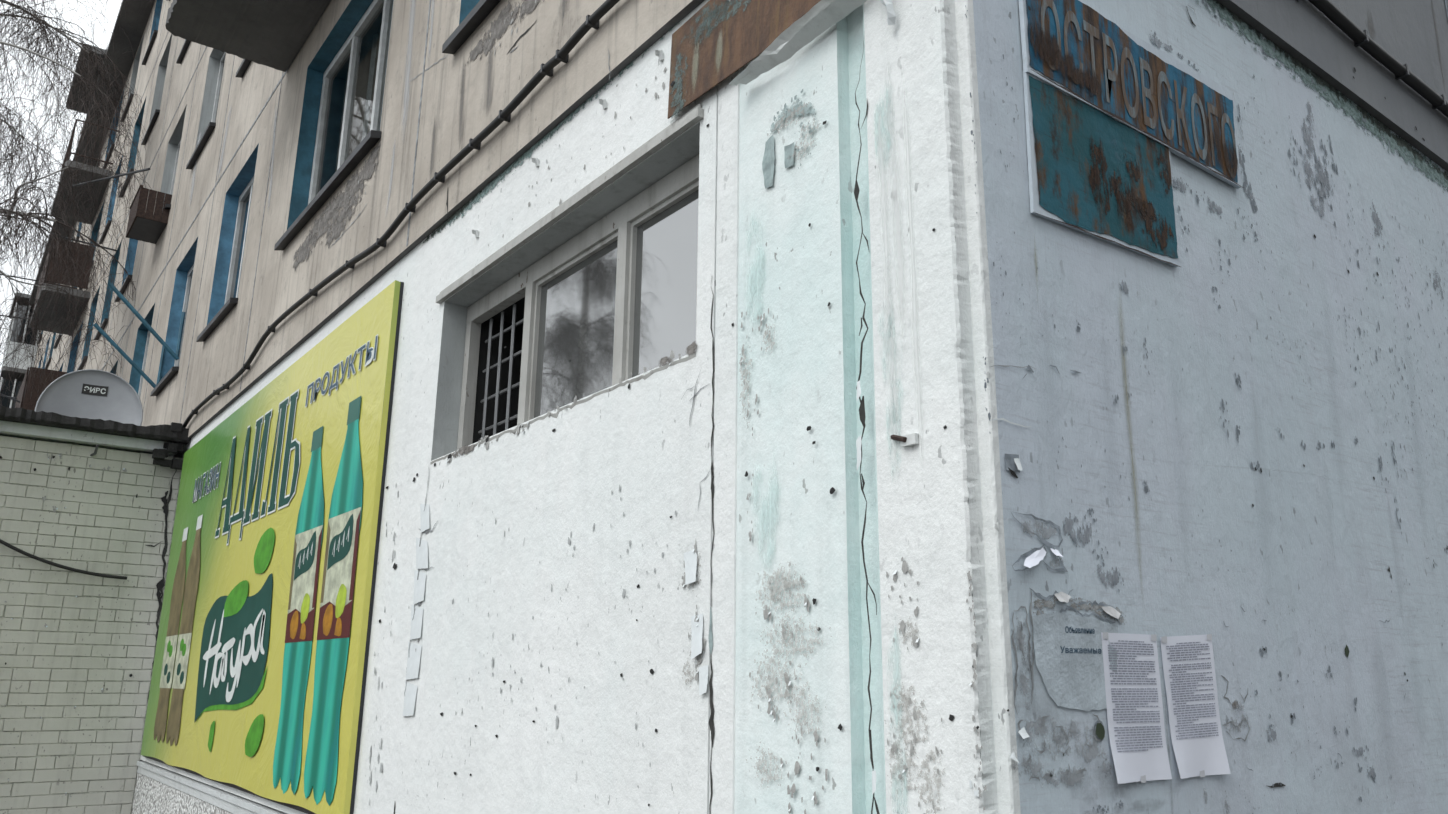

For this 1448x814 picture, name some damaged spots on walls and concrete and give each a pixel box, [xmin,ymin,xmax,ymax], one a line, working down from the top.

peeling [762,89,827,189]
peeling [1264,102,1448,534]
crack [854,44,880,814]
crack [146,456,177,699]
crack [683,280,715,814]
peeling [746,562,843,814]
peeling [886,557,919,650]
peeling [872,682,954,814]
spalling [966,571,977,691]
spalling [969,715,987,814]
peeling [1062,508,1124,592]